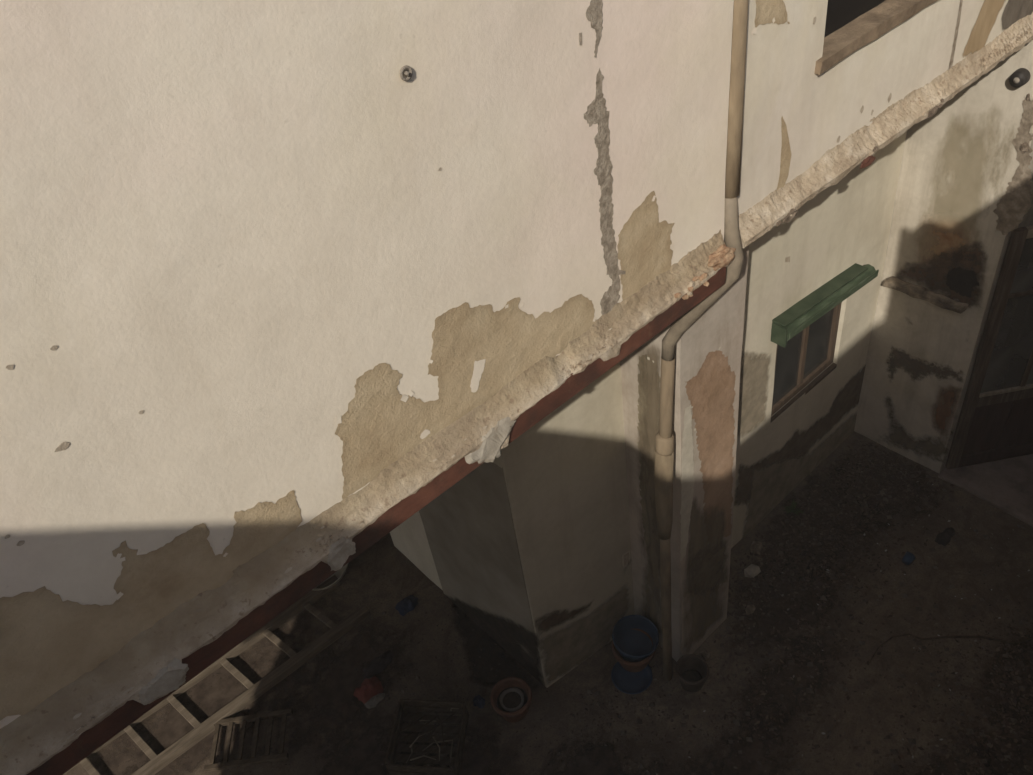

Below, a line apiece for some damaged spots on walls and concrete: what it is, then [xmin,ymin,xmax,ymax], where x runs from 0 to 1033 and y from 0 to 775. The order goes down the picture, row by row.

peeling [751,0,790,35]
leakage [963,0,1033,56]
flaking render [993,94,1033,236]
peeling [617,191,675,301]
flaking render [674,244,736,300]
peeling [335,294,612,500]
peeling [637,355,660,551]
peeling [685,347,736,537]
leakage [734,353,866,505]
peeling [0,490,302,721]
peeling [327,537,356,571]
leakage [446,596,591,690]